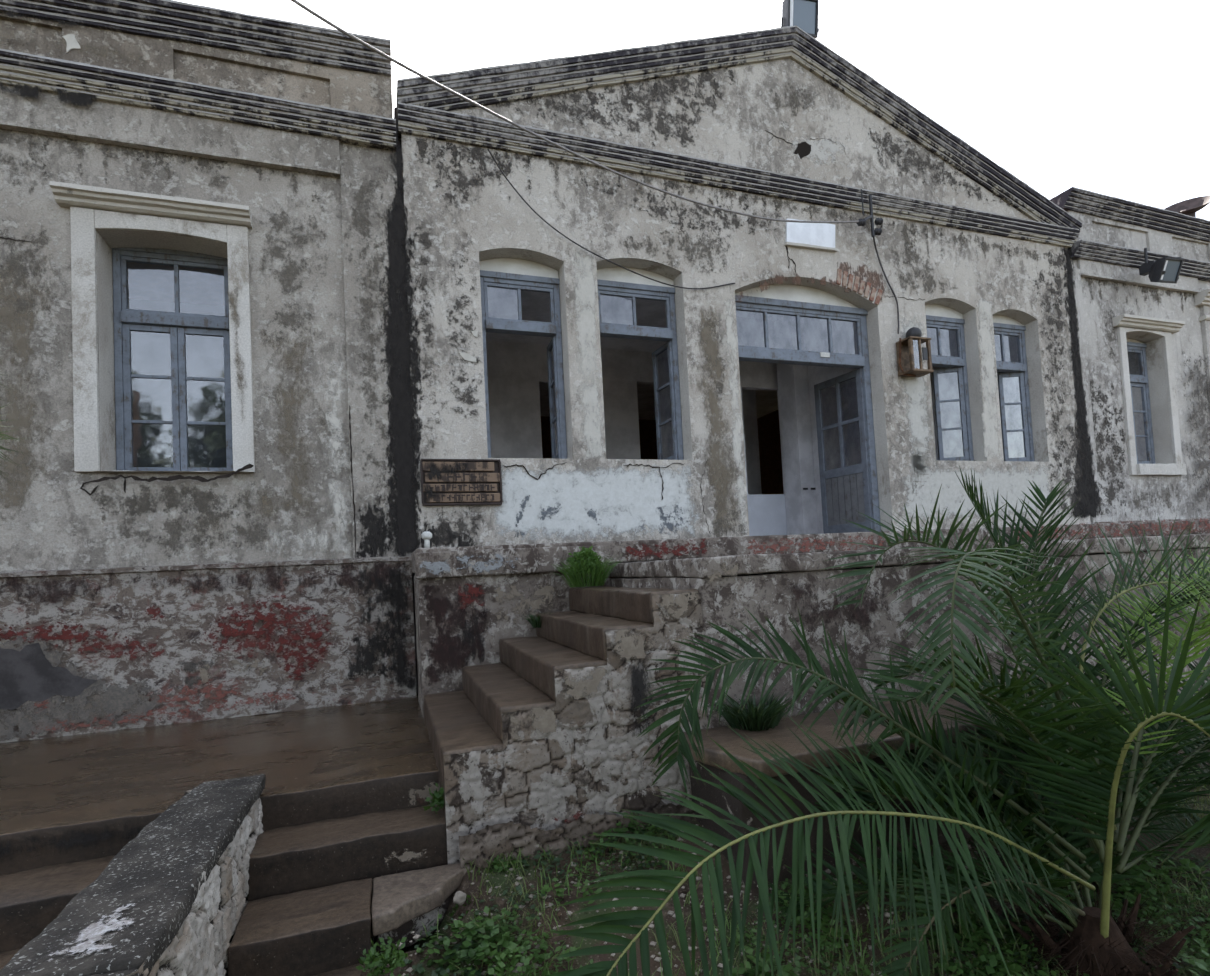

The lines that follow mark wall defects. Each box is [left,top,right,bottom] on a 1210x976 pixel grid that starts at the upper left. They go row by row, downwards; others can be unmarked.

water stain [496,67,735,147]
water stain [774,83,820,116]
spalling [793,138,844,164]
flaking render [836,262,885,306]
water stain [0,128,1210,689]
crack [503,462,567,480]
crack [625,460,710,533]
peeling [626,538,709,559]
peeling [747,535,884,554]
peeling [0,621,167,662]
peeling [32,594,333,735]
spalling [37,904,135,962]